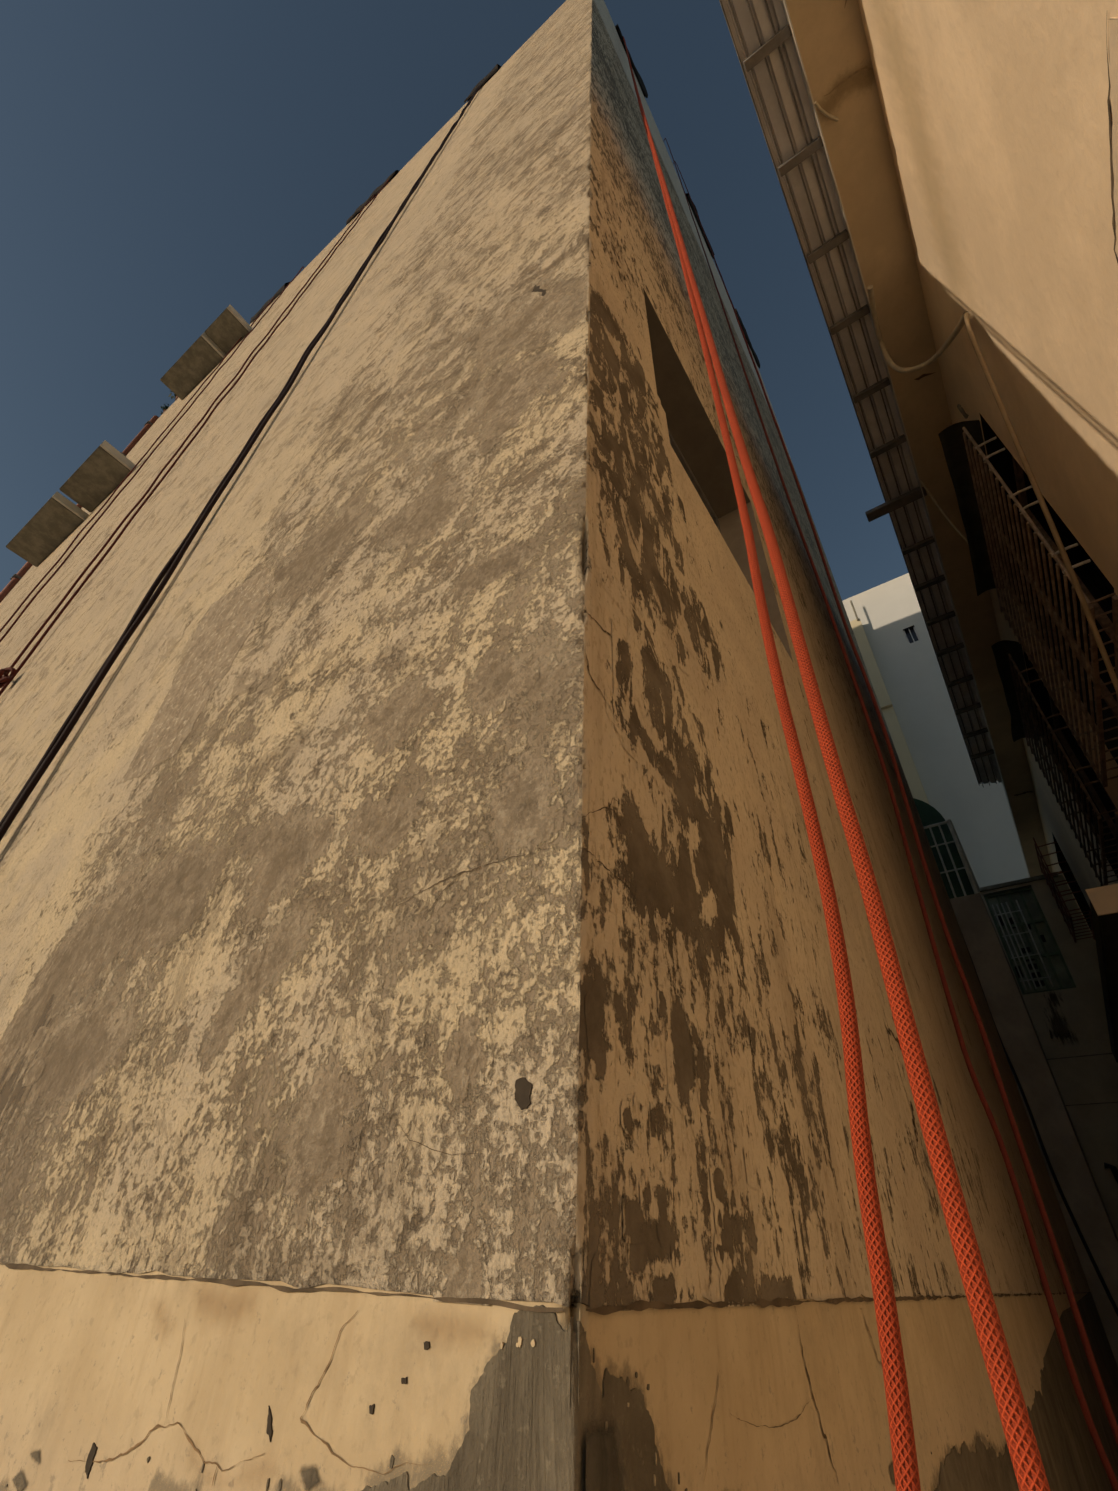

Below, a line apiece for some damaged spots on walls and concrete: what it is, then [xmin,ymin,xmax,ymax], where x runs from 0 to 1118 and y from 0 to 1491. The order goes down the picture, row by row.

crack [1106,22,1118,263]
crack [0,1263,1091,1485]